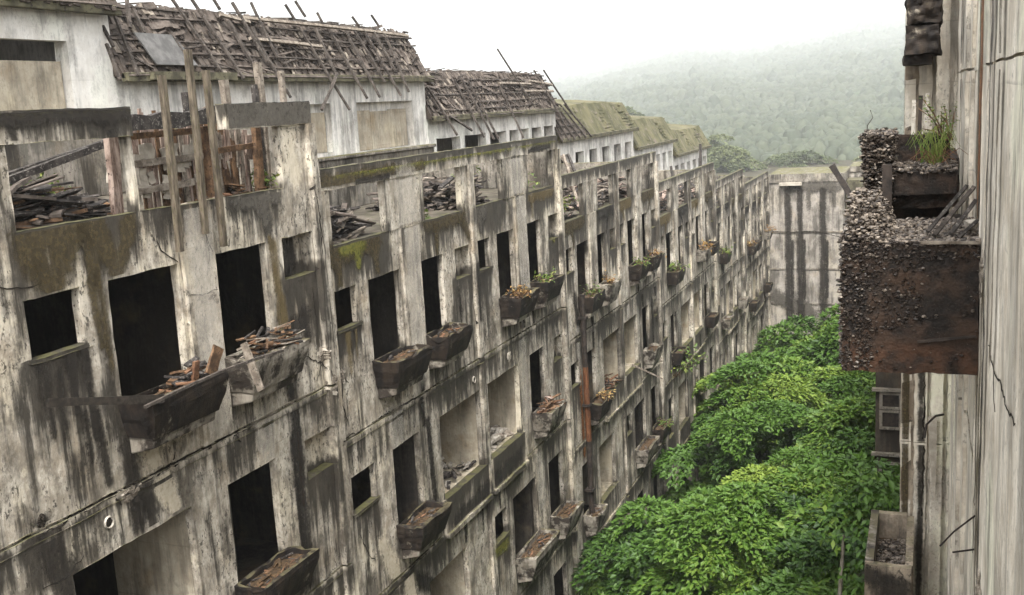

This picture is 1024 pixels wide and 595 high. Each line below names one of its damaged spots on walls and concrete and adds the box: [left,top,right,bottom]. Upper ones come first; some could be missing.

water stain [320,158,425,188]
water stain [329,236,383,288]
water stain [736,181,842,333]
water stain [7,214,159,537]
water stain [420,377,437,501]
corrosion [579,367,592,457]
crack [972,345,1016,553]
water stain [32,512,80,595]